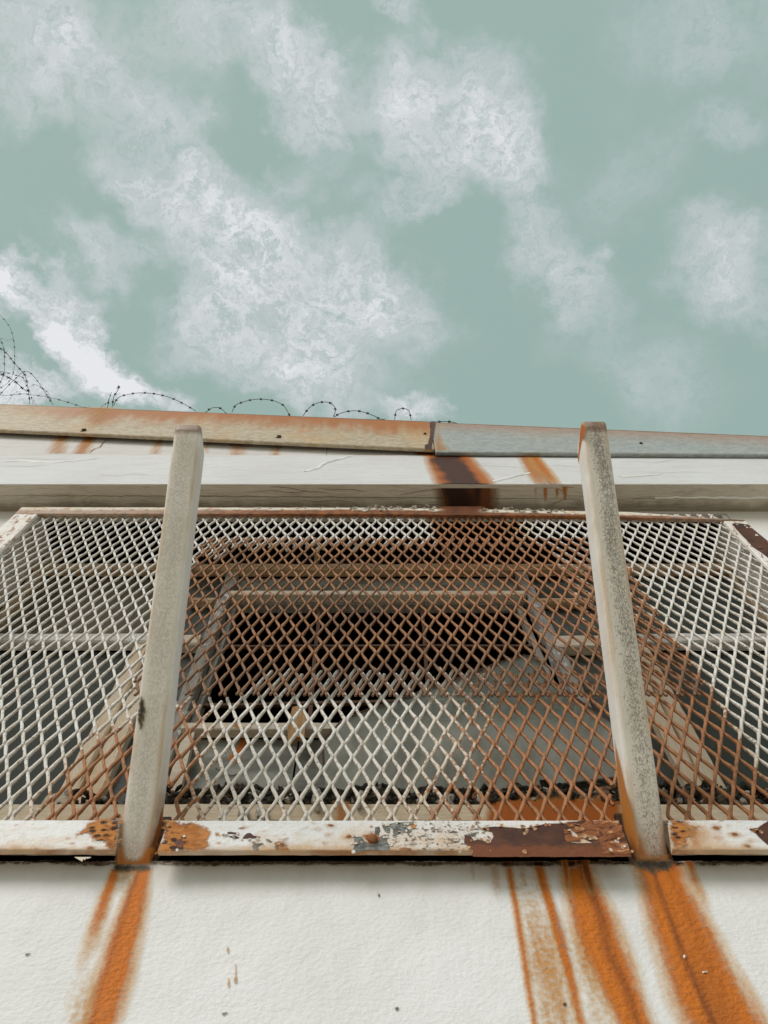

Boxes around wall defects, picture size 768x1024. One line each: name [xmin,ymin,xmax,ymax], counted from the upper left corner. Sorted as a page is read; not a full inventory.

rust [76,437,94,453]
rust [417,421,496,515]
rust [521,456,567,499]
peeling [350,822,416,854]
peeling [564,820,634,865]
rust [464,747,768,1024]
rust [73,809,220,1024]